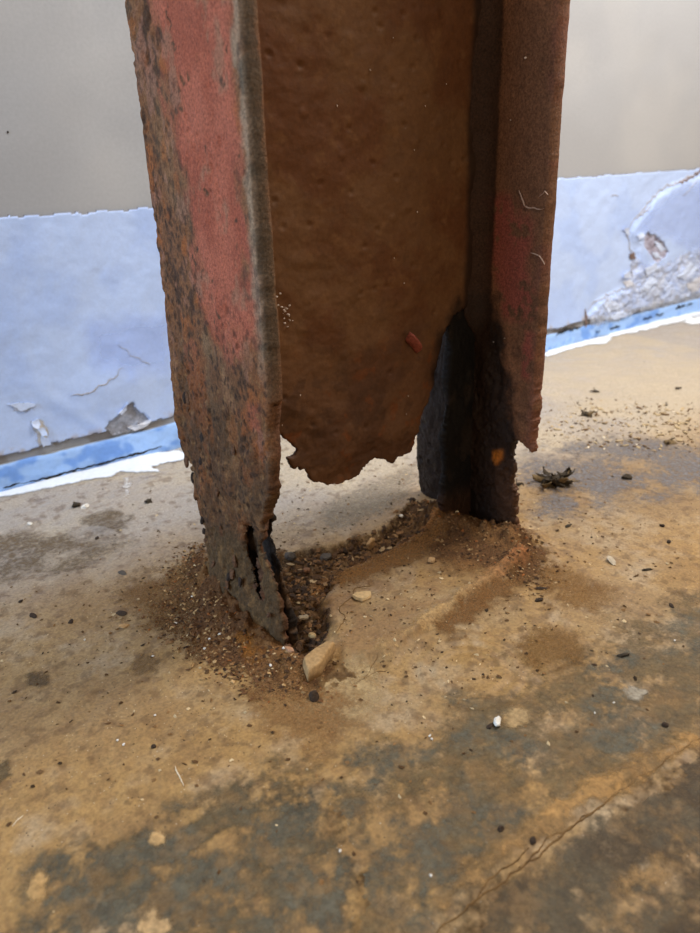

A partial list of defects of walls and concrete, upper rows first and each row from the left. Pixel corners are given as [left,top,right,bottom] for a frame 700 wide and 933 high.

peeling [591,232,700,326]
peeling [32,418,51,447]
spalling [105,402,152,435]
corrosion [333,509,611,634]
damp [0,760,11,782]
damp [20,593,700,933]
crack [436,738,700,933]